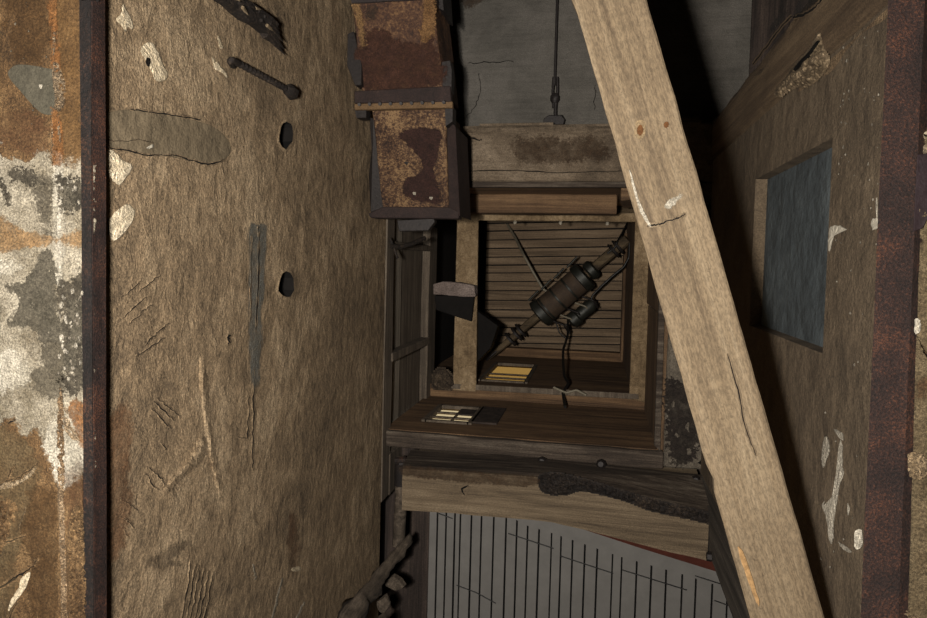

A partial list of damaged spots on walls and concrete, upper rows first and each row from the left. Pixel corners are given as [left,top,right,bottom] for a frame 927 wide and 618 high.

corrosion [47,0,61,72]
peeling [141,42,168,82]
peeling [212,57,228,78]
corrosion [354,28,447,91]
corrosion [399,127,442,204]
leakage [0,31,83,568]
flaking render [904,221,927,618]